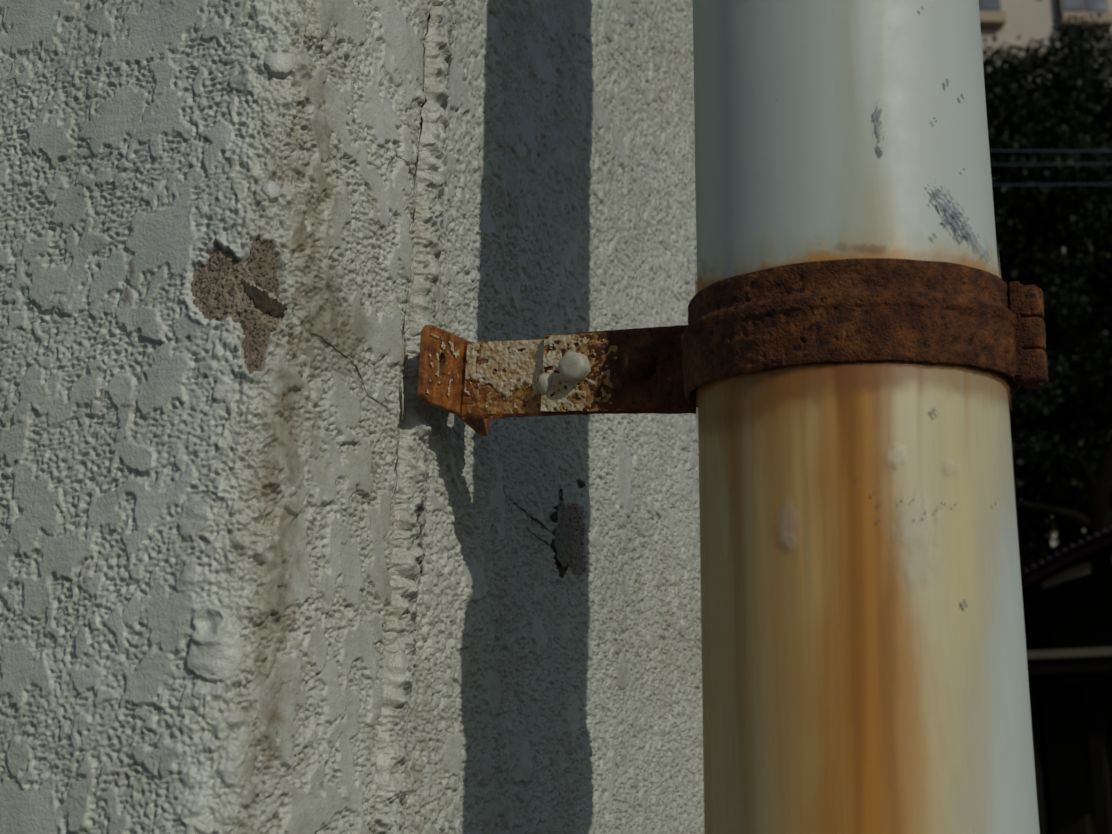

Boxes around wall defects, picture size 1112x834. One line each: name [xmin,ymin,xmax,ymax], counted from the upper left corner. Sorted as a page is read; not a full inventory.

crack [396,4,433,182]
spalling [191,239,288,374]
crack [290,209,415,521]
rust [695,268,722,294]
rust [806,248,842,262]
spalling [550,488,587,579]
rust [698,361,1010,834]